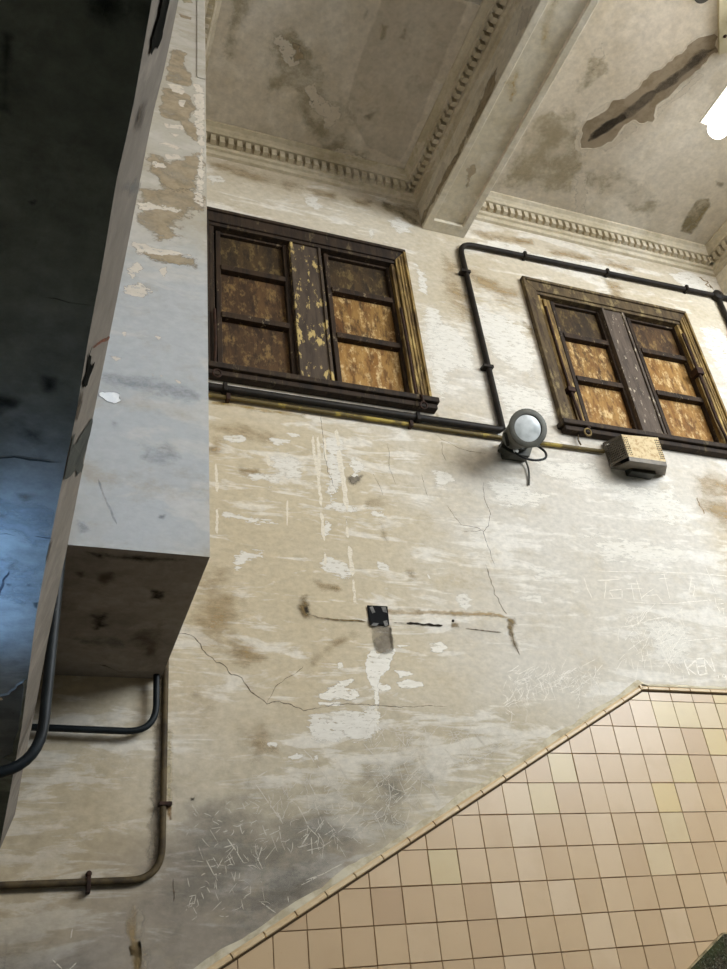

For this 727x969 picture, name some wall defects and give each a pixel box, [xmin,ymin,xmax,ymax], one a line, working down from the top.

spalling [574,32,718,154]
peeling [152,83,225,207]
peeling [136,202,183,213]
peeling [388,217,414,234]
peeling [124,242,193,298]
peeling [223,435,246,443]
peeling [243,432,305,487]
peeling [321,430,387,539]
peeling [232,549,263,571]
crack [448,484,520,655]
crack [181,633,444,711]
peeling [306,645,424,745]